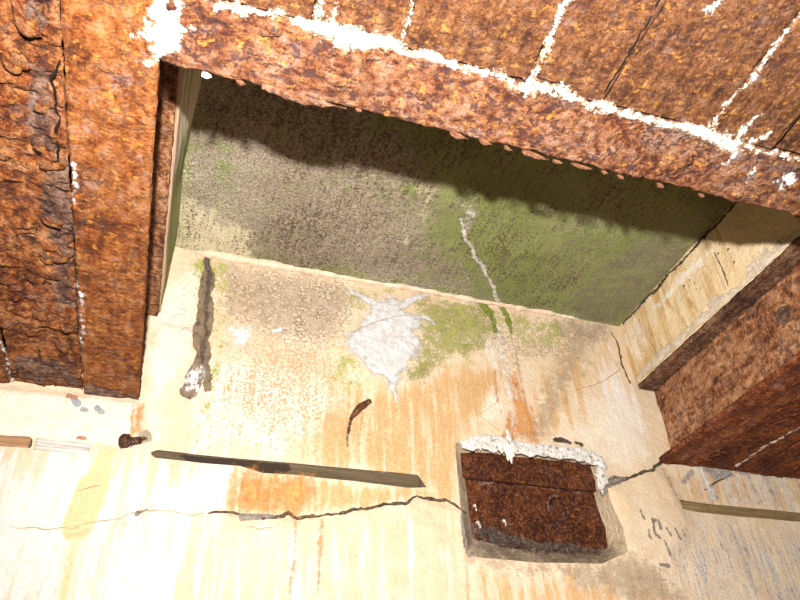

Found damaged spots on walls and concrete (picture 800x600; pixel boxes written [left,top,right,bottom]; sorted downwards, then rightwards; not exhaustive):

rust [10,0,42,39]
rust [260,26,282,37]
rust [262,84,362,112]
rust [34,137,67,171]
rust [504,145,624,179]
crack [576,203,737,390]
rust [346,399,372,446]
rust [503,354,536,443]
water stain [459,323,609,495]
rust [232,471,315,510]
crack [600,462,663,496]
crack [0,495,466,530]